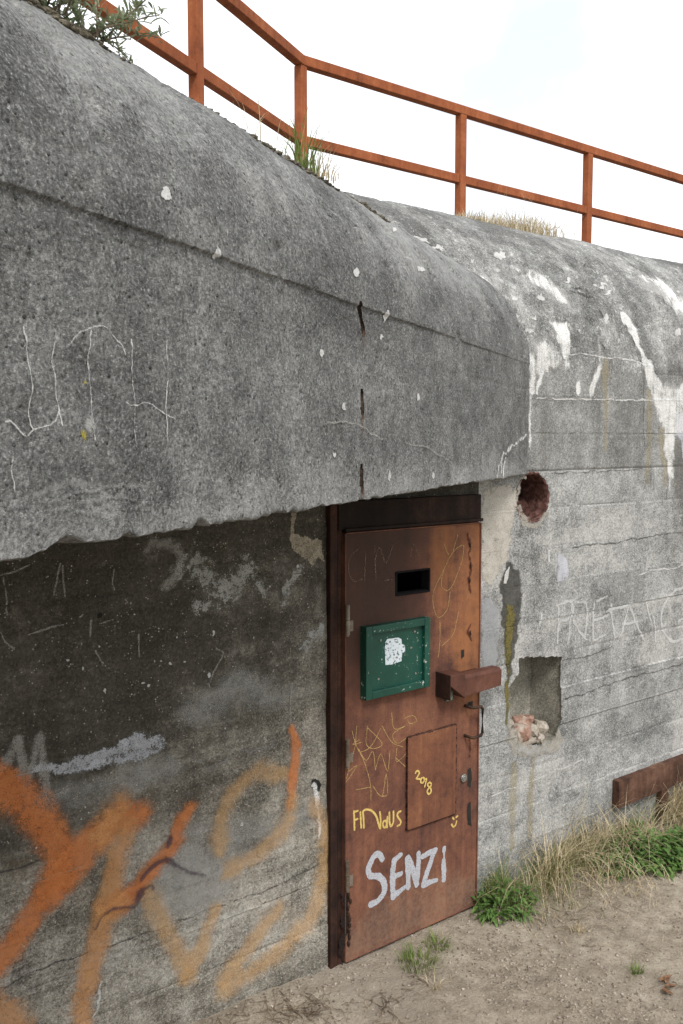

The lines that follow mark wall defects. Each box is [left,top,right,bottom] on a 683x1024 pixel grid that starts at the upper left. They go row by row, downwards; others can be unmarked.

water stain [639,274,683,336]
water stain [576,346,601,398]
spalling [516,475,549,528]
peeling [281,513,325,607]
spalling [506,719,564,757]
crack [0,863,321,988]